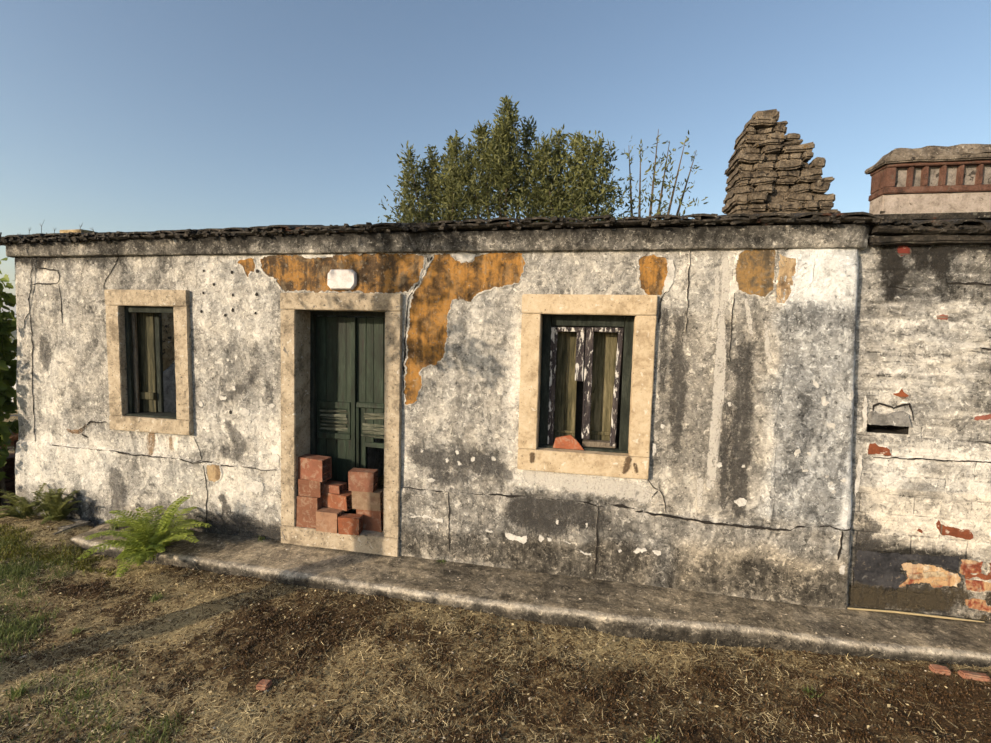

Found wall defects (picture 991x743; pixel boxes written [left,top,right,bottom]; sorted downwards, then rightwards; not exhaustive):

spalling [636,253,675,297]
spalling [733,249,799,305]
spalling [230,252,527,406]
crack [24,264,277,532]
peeling [219,386,251,424]
crack [401,249,853,574]
water stain [697,257,772,518]
peeling [849,390,868,429]
flaking render [972,412,991,421]
water stain [408,446,654,536]
flaking render [915,519,975,540]
peeling [839,536,991,613]